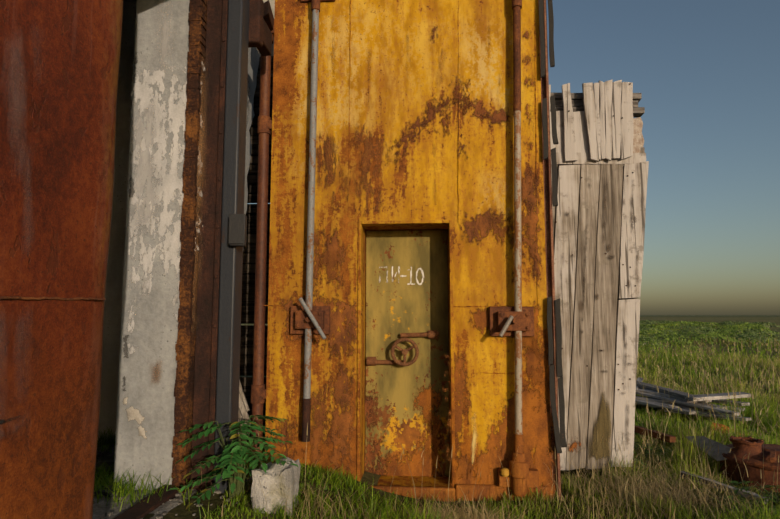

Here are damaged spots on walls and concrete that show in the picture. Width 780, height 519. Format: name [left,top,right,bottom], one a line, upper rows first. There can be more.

peeling [123,57,187,358]
rust [316,77,510,216]
rust [460,170,545,286]
flaking render [123,376,147,439]
rust [365,301,557,496]
water stain [569,393,611,460]